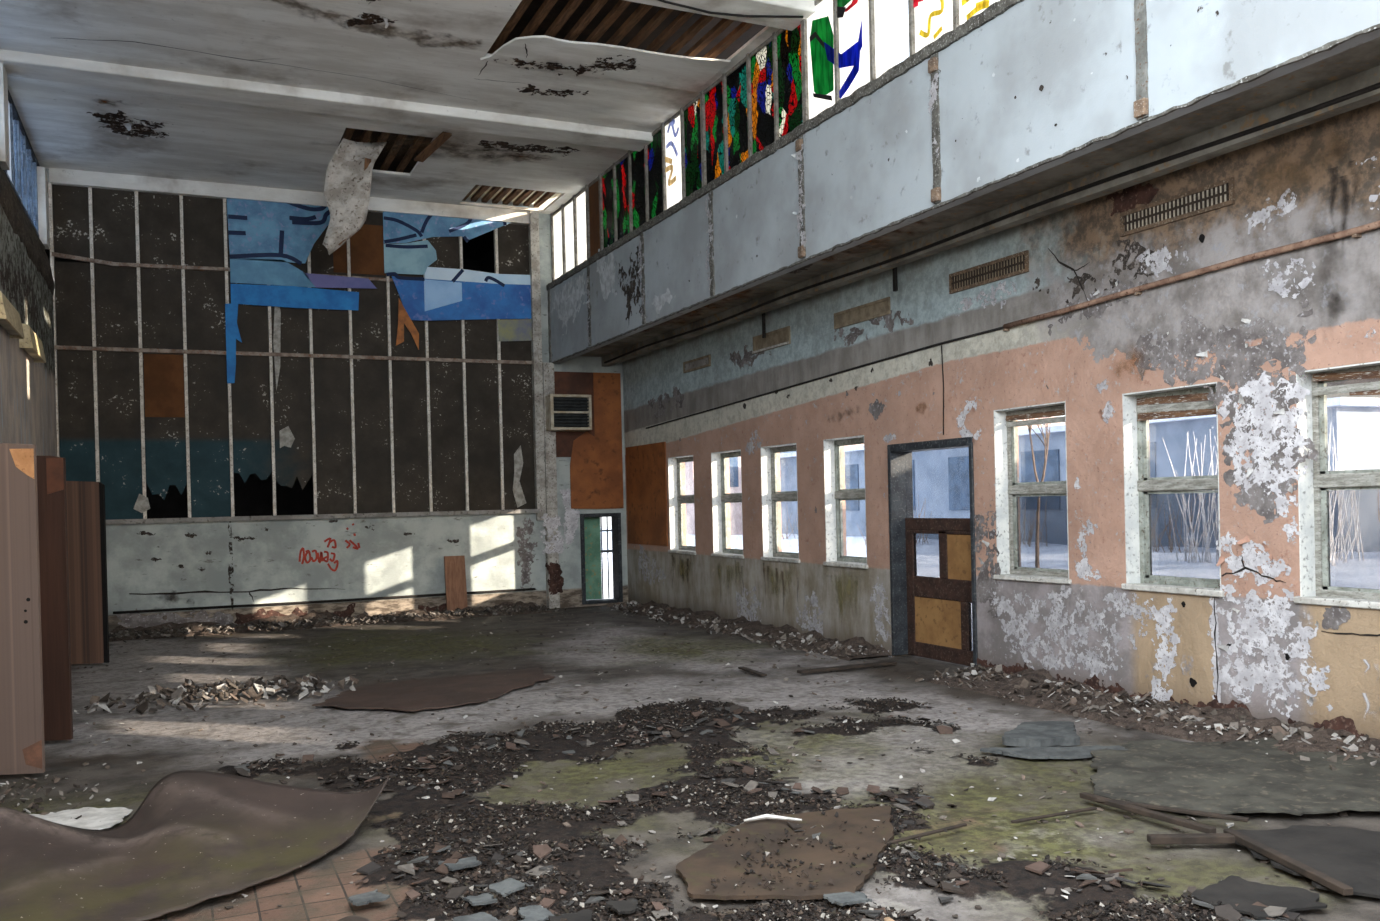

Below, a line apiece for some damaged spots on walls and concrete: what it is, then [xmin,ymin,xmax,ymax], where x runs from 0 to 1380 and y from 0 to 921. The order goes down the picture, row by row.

leakage [272,0,398,36]
leakage [411,33,481,47]
leakage [87,110,173,140]
leakage [1331,146,1356,230]
leakage [1330,295,1340,312]
peeling [974,258,1364,738]
crack [1321,629,1380,637]